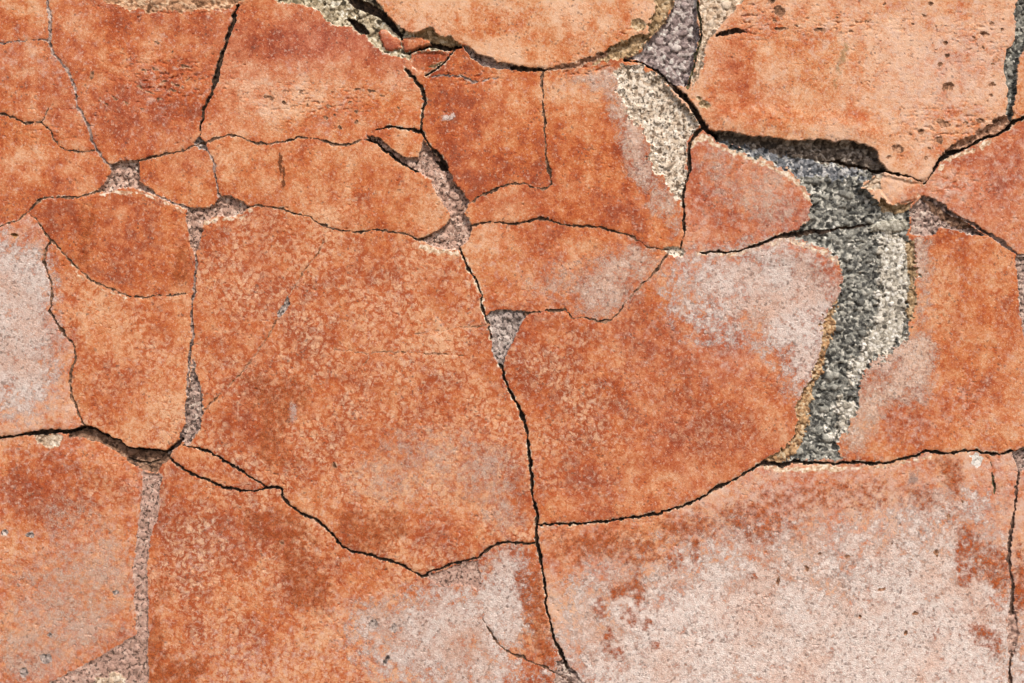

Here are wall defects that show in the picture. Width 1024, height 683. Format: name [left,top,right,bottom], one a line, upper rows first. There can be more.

crack [0,0,114,170]
spalling [275,0,513,73]
spalling [367,136,473,251]
crack [138,0,870,366]
spalling [548,0,1024,463]
crack [820,116,1024,256]
spalling [486,309,526,365]
spalling [34,359,204,683]
crack [0,189,1020,683]